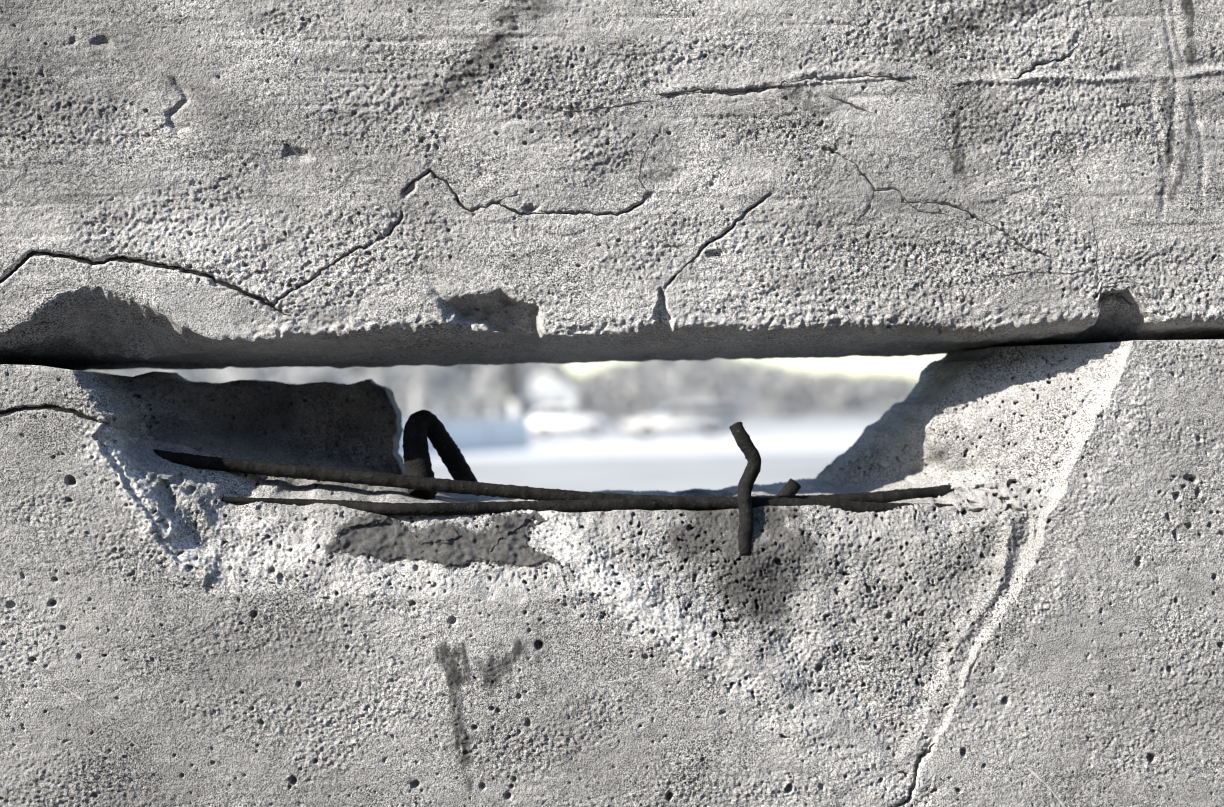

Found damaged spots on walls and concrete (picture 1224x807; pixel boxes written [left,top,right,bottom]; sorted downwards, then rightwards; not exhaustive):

leakage [1181,0,1196,64]
leakage [1155,79,1190,196]
crack [0,74,913,316]
crack [811,143,1099,308]
spalling [414,269,547,335]
spalling [653,284,676,332]
spalling [1095,288,1155,323]
crack [0,404,123,429]
spalling [0,292,1131,798]
leakage [434,631,544,791]
crack [896,743,934,807]